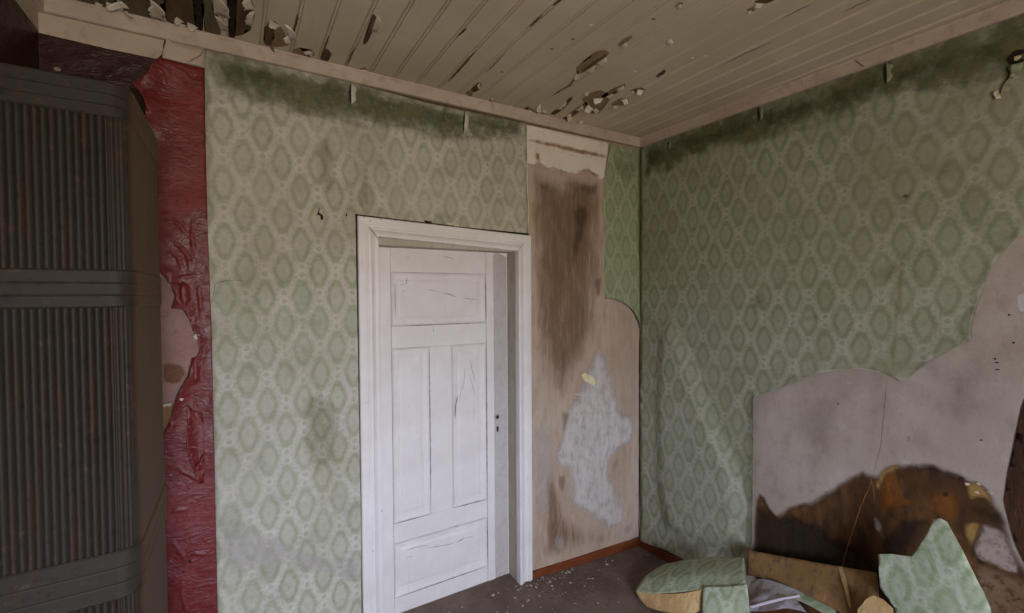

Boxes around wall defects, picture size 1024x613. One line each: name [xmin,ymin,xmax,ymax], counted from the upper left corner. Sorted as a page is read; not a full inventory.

peeling [77,0,334,62]
leakage [221,63,519,137]
peeling [363,14,381,45]
peeling [509,83,646,165]
peeling [574,35,632,81]
leakage [646,14,1024,174]
leakage [542,188,591,377]
peeling [160,273,205,484]
peeling [526,162,641,570]
peeling [752,235,1024,573]
crack [842,477,874,567]
leakage [754,466,1024,613]